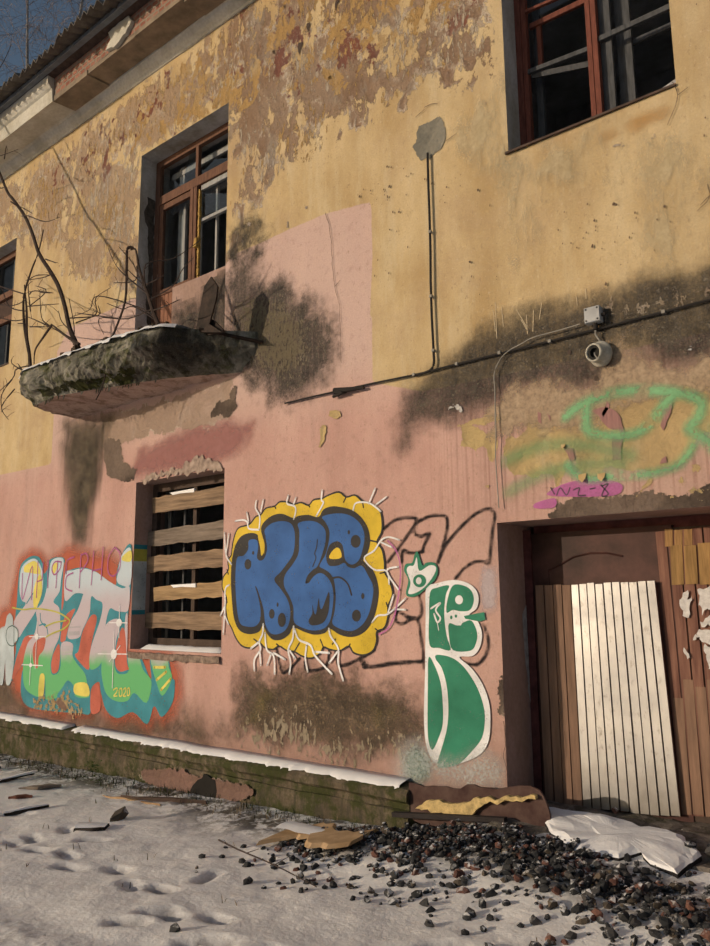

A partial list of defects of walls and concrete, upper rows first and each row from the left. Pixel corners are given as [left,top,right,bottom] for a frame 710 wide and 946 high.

peeling [0,0,495,325]
damp [30,367,140,403]
mould [145,303,213,373]
mould [212,219,333,403]
damp [402,267,710,444]
damp [64,417,111,545]
flaking render [103,438,223,485]
peeling [448,385,710,519]
damp [233,669,424,768]